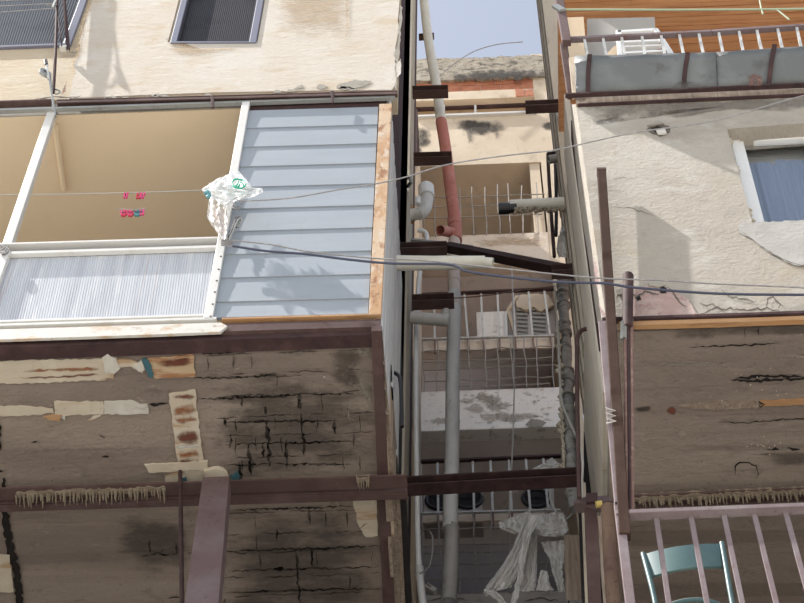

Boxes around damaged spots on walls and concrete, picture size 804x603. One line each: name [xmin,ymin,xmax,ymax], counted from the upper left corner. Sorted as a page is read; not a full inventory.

leakage [461,120,500,141]
crack [690,289,781,348]
peeling [0,354,196,384]
crack [732,374,804,383]
peeling [0,400,149,421]
peeling [144,389,240,482]
crack [718,417,804,425]
leakage [15,488,165,509]
crack [0,470,24,603]
crack [223,505,381,603]